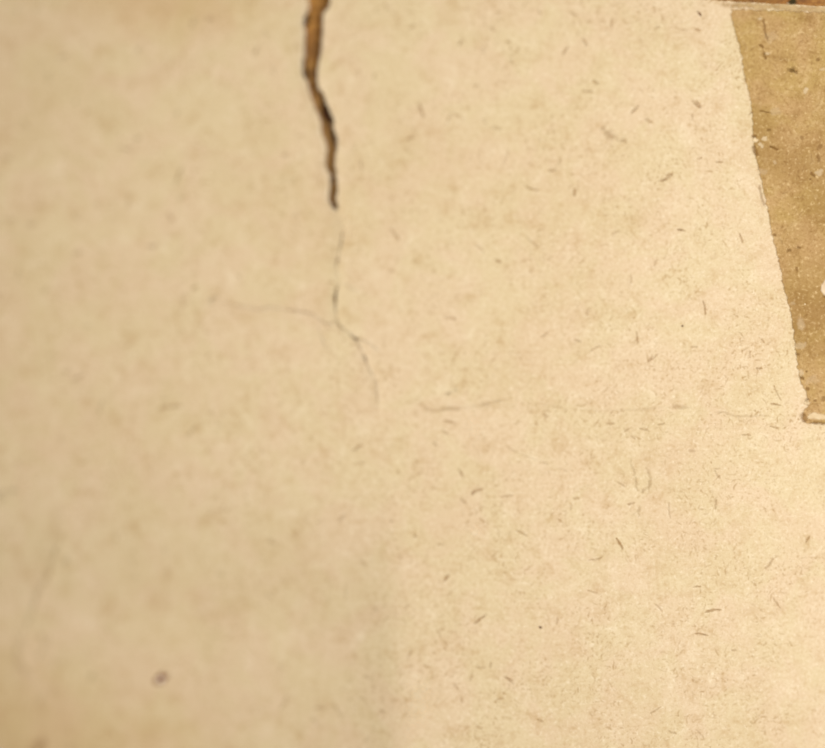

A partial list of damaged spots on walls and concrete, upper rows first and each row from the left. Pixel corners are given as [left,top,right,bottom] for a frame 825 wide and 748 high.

crack [299,0,340,212]